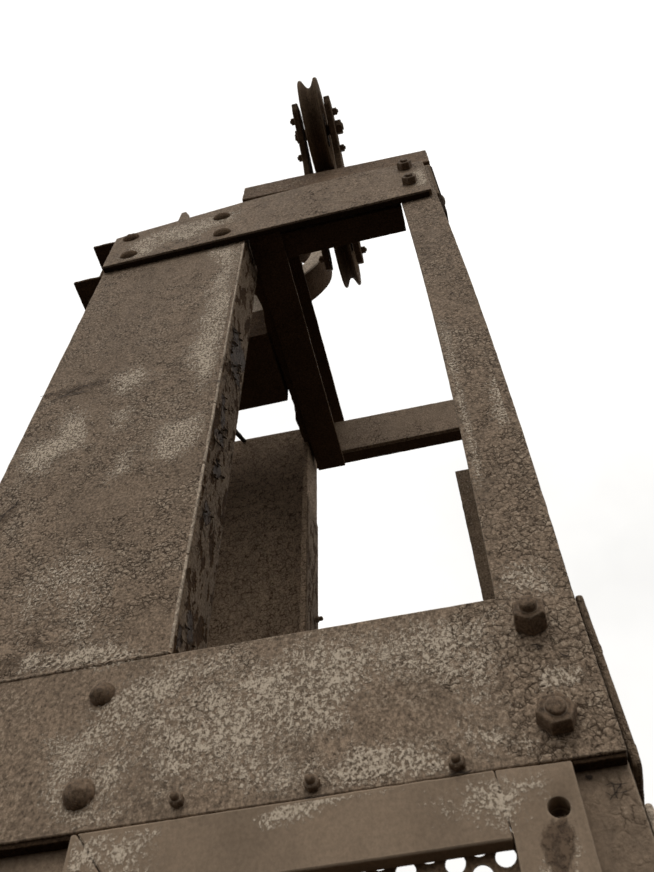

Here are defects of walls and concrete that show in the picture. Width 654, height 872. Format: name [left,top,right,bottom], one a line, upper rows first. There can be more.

peeling [13,406,93,477]
peeling [13,546,146,675]
peeling [36,242,555,872]